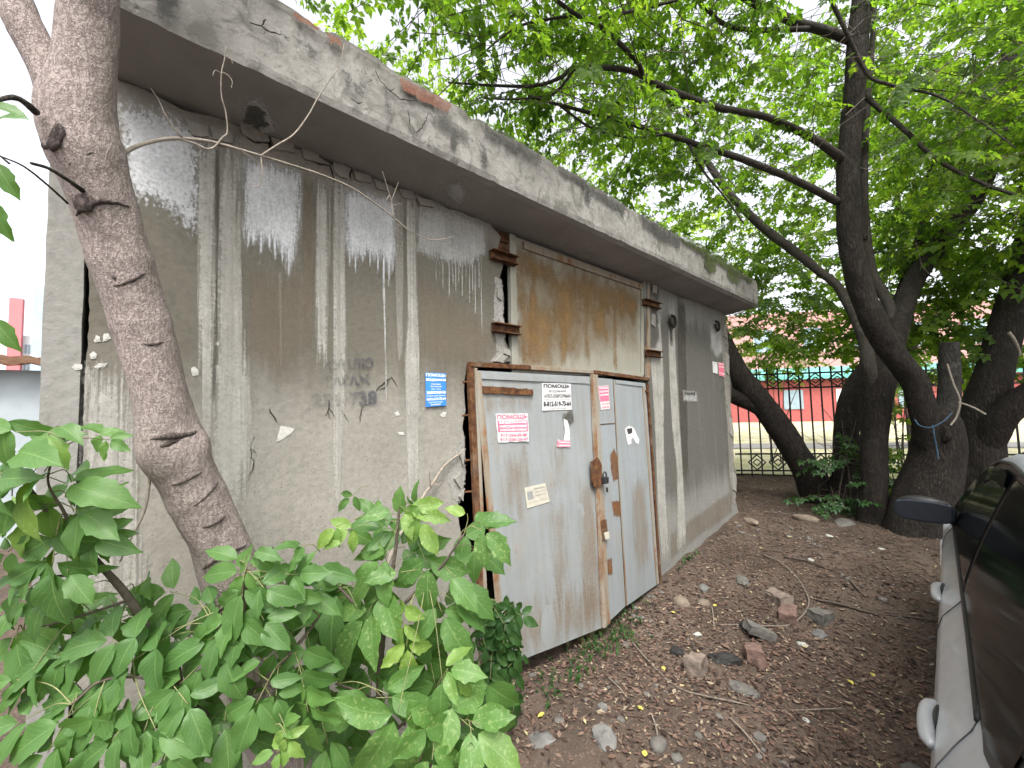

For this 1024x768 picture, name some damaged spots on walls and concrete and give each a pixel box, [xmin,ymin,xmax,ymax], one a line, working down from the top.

crack [250,19,282,35]
flaking render [400,78,451,112]
spalling [184,101,295,153]
water stain [119,105,485,507]
spalling [490,276,511,364]
crack [325,378,397,422]
rust [610,449,618,481]
rust [612,501,621,517]